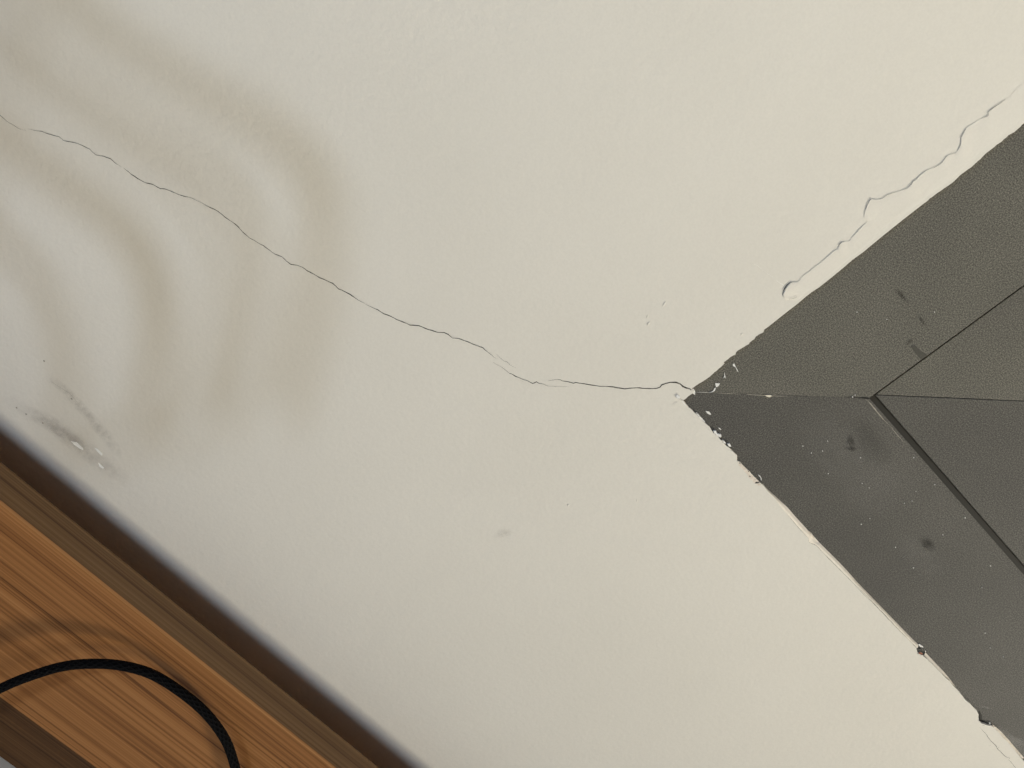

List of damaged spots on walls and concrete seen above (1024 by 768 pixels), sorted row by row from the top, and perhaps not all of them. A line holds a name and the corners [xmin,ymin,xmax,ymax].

peeling [782,84,1024,300]
crack [0,115,691,390]
spalling [676,364,738,447]
spalling [738,461,762,486]
spalling [977,708,1024,759]